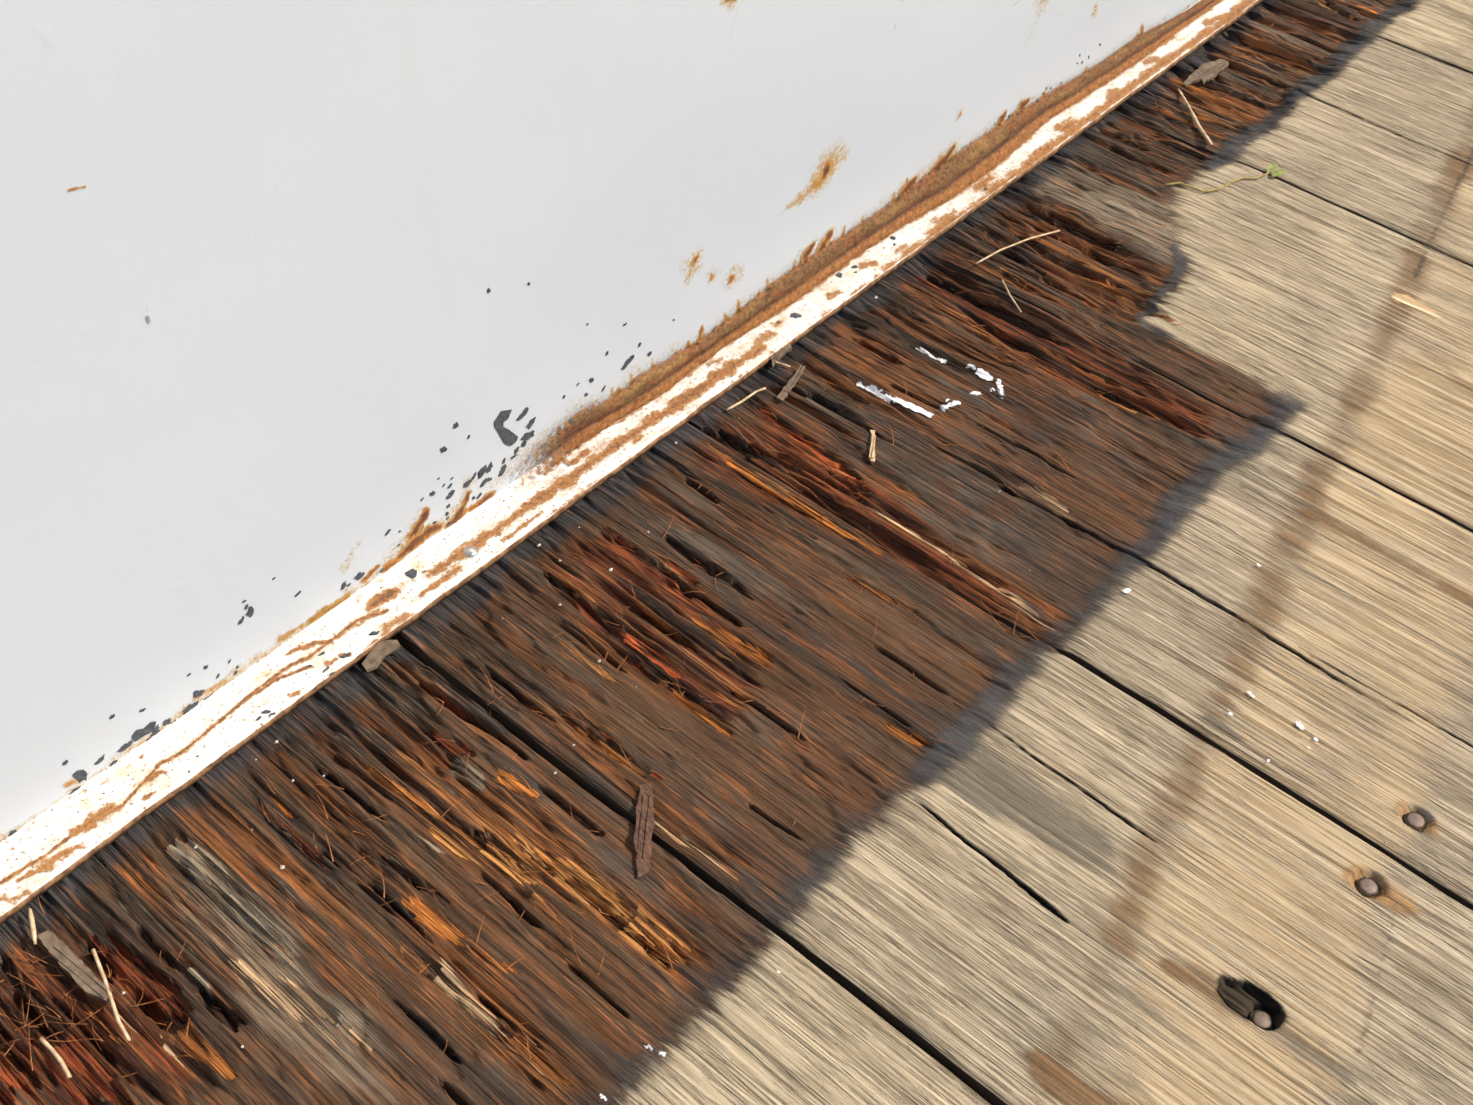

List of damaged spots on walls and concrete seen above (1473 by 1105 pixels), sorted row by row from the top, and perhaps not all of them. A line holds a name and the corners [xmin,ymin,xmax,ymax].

water stain [1207,0,1418,168]
rust [121,0,1256,759]
peeling [420,407,536,527]
peeling [238,600,254,625]
water stain [1027,139,1473,1105]
peeling [62,659,259,795]
water stain [913,633,1118,875]
rust [0,802,116,916]